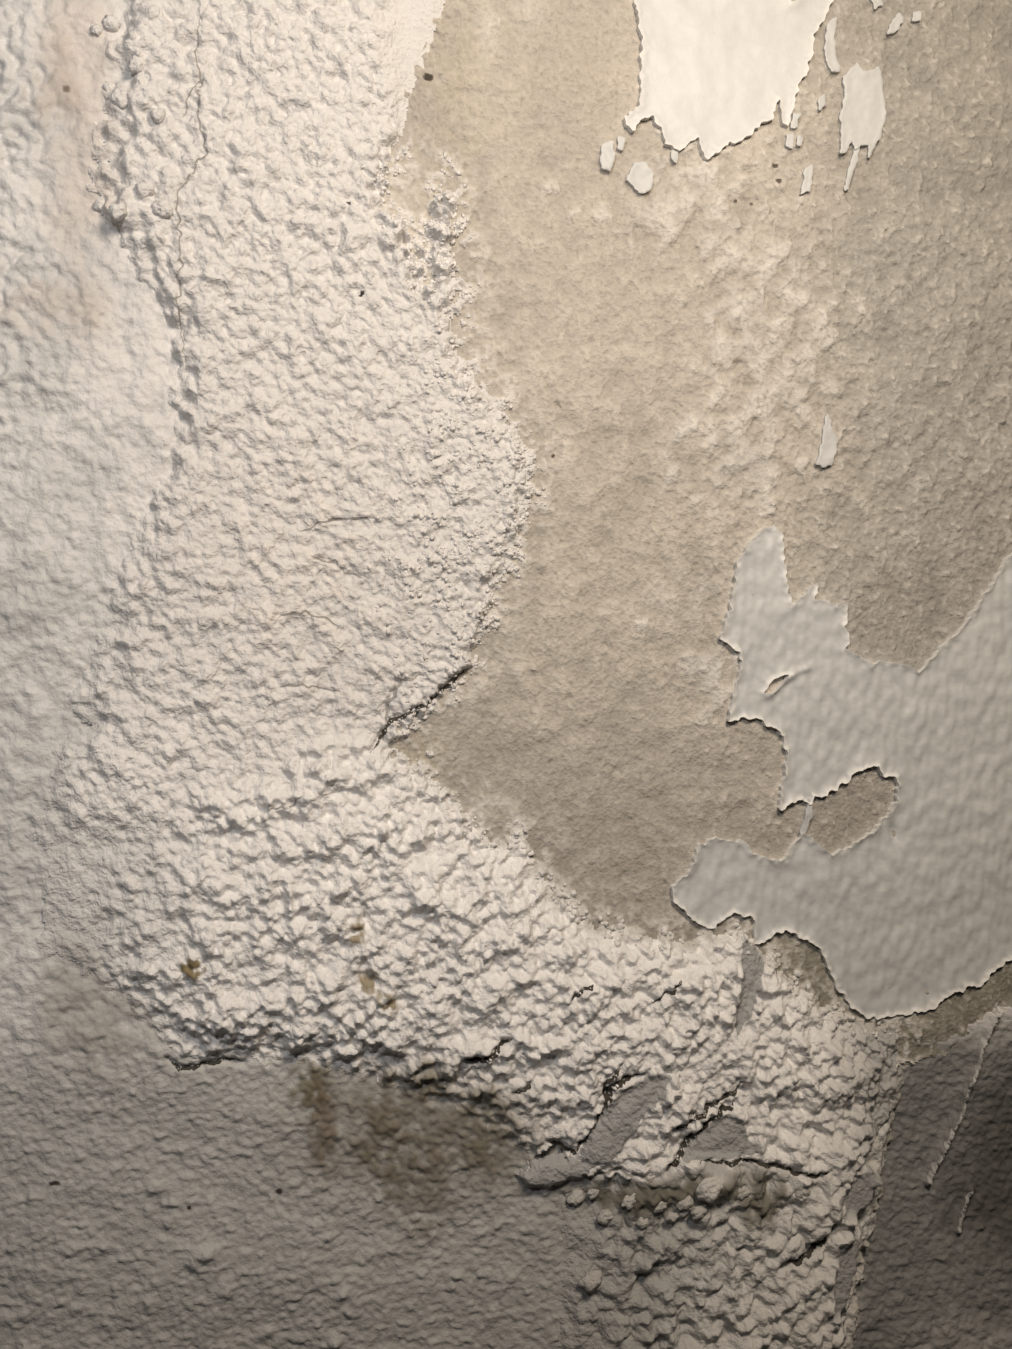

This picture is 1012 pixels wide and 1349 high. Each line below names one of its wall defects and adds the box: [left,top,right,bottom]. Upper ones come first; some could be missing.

flaking render [378,0,1012,1185]
crack [370,672,463,753]
spalling [31,716,911,1187]
spalling [565,1188,600,1206]
spalling [596,1193,636,1226]
spalling [636,1175,725,1229]
spalling [736,1185,752,1201]
peeling [957,1191,974,1233]
spalling [577,1270,602,1293]